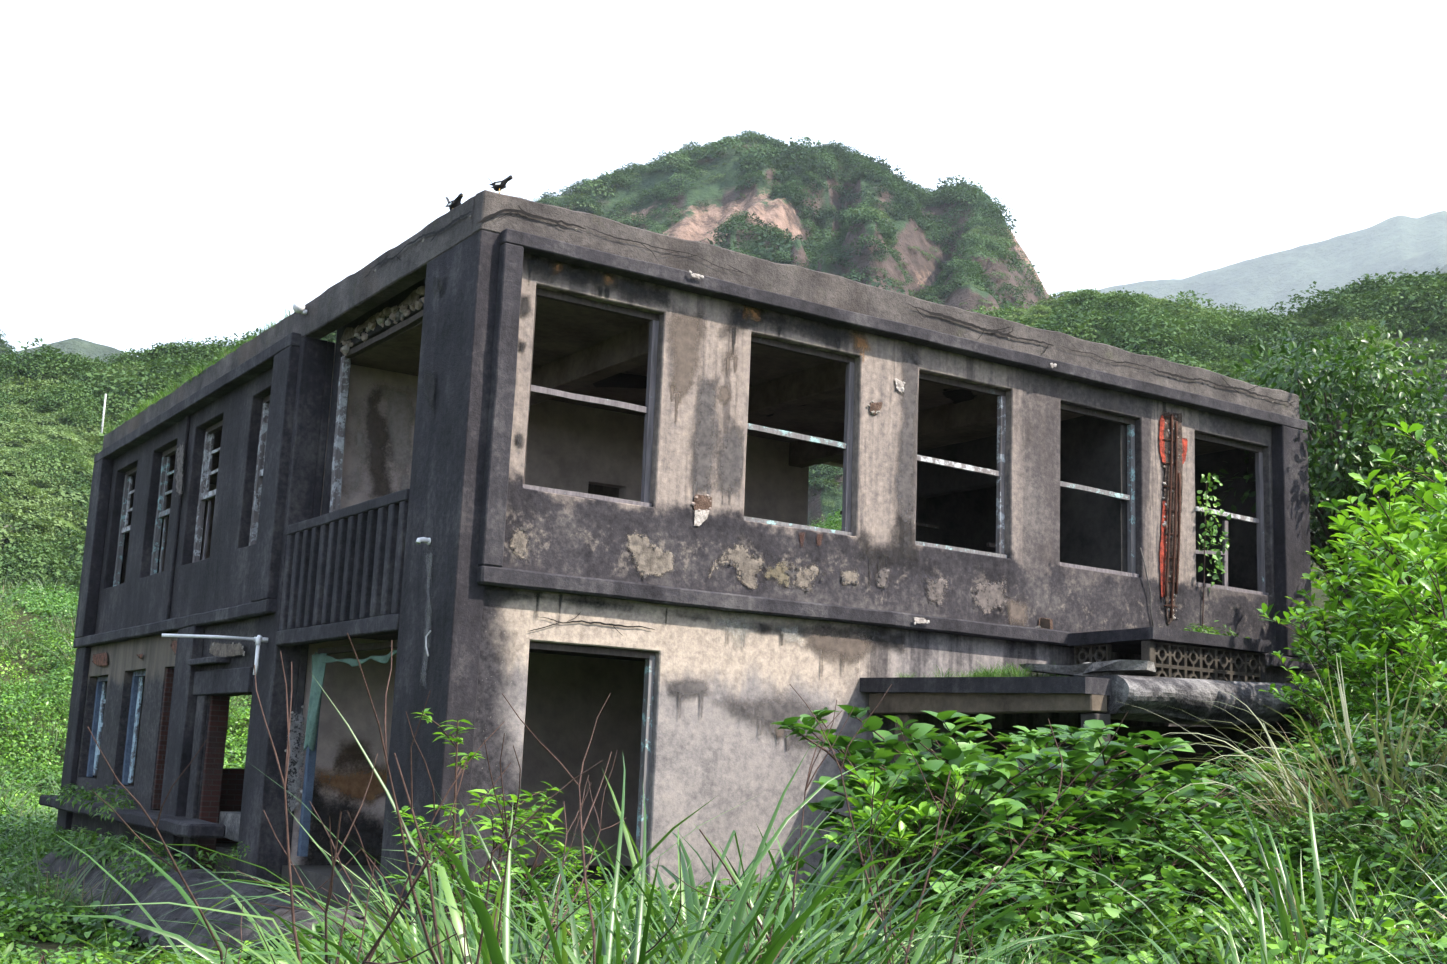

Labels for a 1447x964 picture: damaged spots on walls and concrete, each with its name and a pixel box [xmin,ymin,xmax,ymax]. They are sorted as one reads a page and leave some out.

water stain [520,296,531,316]
water stain [525,255,854,516]
spalling [691,494,712,526]
corrosion [1159,411,1188,624]
water stain [487,586,634,624]
flaking render [627,534,676,578]
flaking render [709,544,824,592]
flaking render [842,571,859,585]
flaking render [876,568,890,588]
flaking render [973,581,1007,614]
water stain [727,617,906,677]
water stain [670,679,709,718]